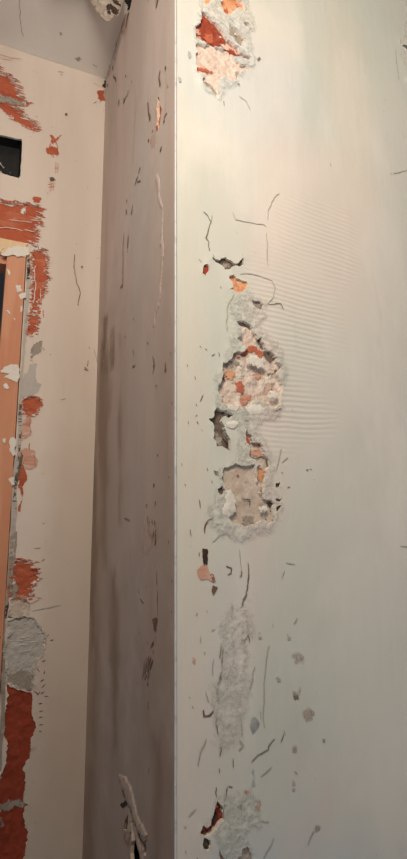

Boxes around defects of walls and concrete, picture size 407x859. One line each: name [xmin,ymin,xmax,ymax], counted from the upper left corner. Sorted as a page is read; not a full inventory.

flaking render [0,54,42,132]
flaking render [188,0,261,102]
flaking render [0,196,52,337]
flaking render [18,396,44,512]
flaking render [203,254,288,542]
flaking render [6,558,45,601]
flaking render [0,684,36,859]
flaking render [200,786,269,859]